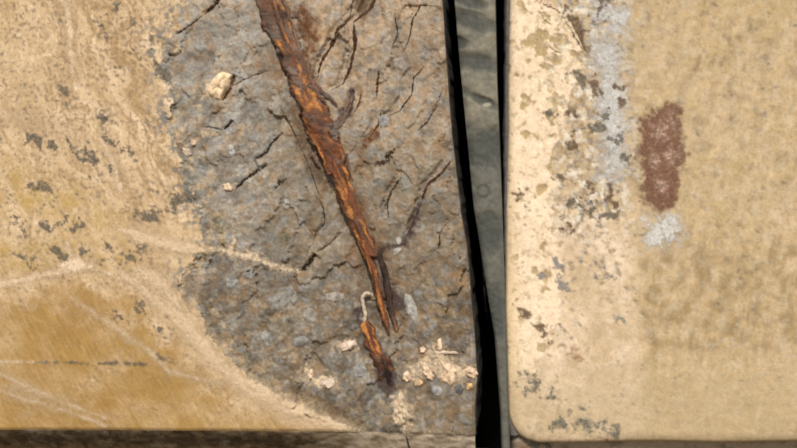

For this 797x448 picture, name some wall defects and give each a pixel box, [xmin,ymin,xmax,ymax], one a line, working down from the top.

crack [177,0,220,34]
crack [222,71,266,101]
corrosion [282,0,355,141]
crack [314,0,376,90]
crack [354,66,424,137]
crack [392,4,431,53]
leakage [561,0,634,220]
crack [235,108,340,271]
spalling [158,0,478,436]
corrosion [306,130,354,196]
corrosion [354,203,421,261]
leakage [640,213,686,251]